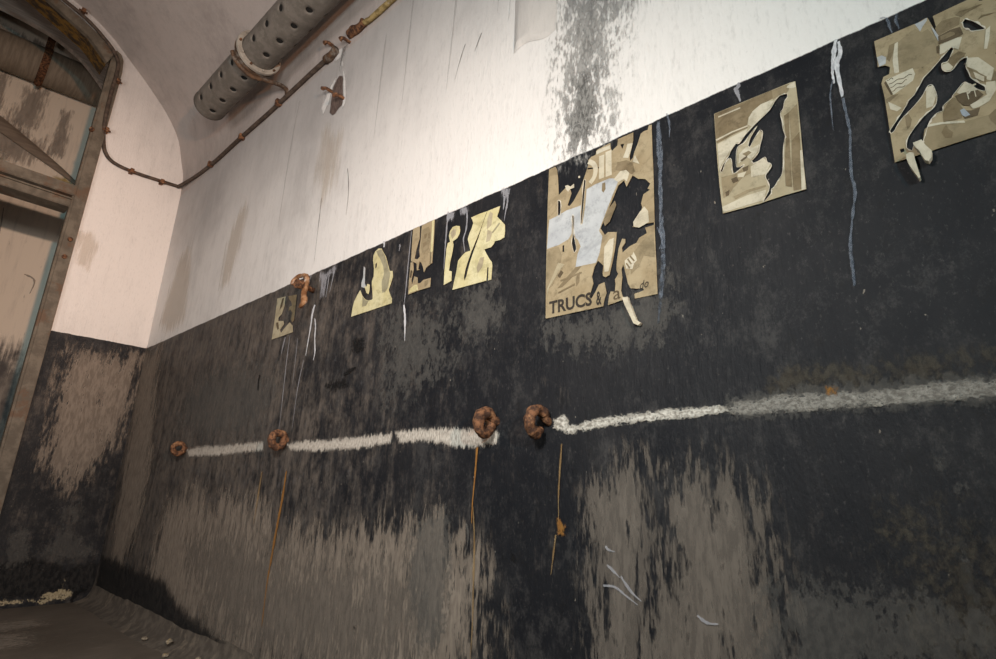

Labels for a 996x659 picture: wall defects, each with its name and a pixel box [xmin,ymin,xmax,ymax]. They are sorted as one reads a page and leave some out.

spalling [322,46,346,115]
water stain [553,0,629,162]
water stain [0,556,219,642]
corrosion [262,471,287,622]
corrosion [470,447,478,658]
corrosion [551,444,566,572]